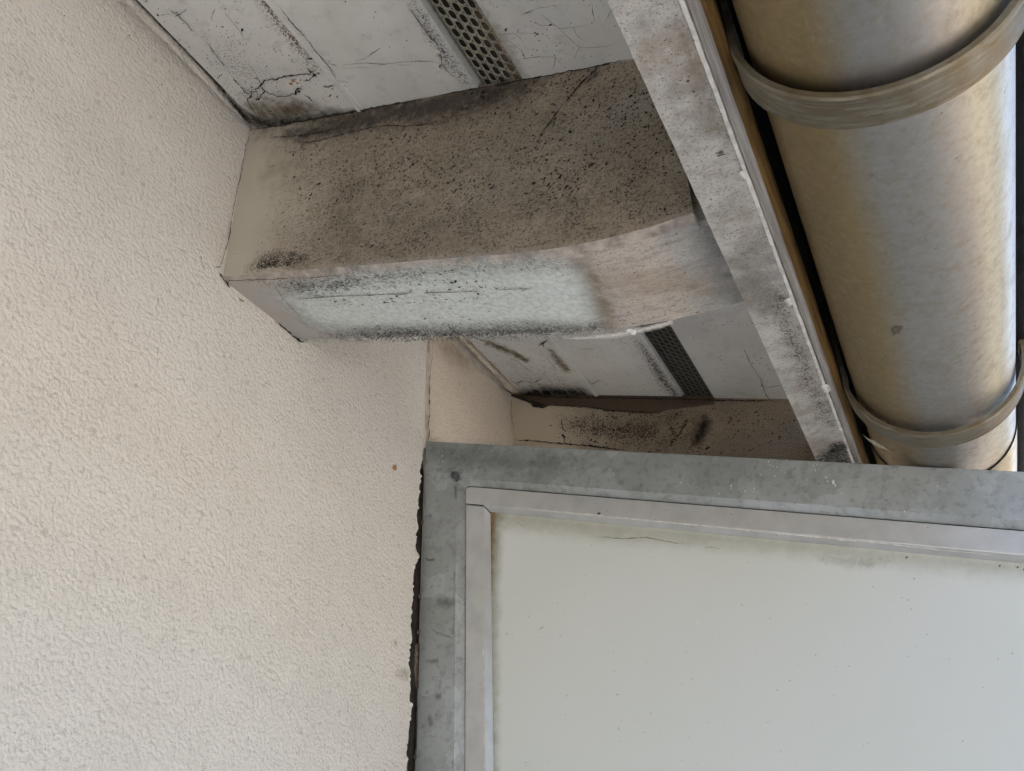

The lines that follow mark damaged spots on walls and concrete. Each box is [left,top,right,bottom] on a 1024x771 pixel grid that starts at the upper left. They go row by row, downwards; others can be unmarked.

water stain [157,3,856,463]